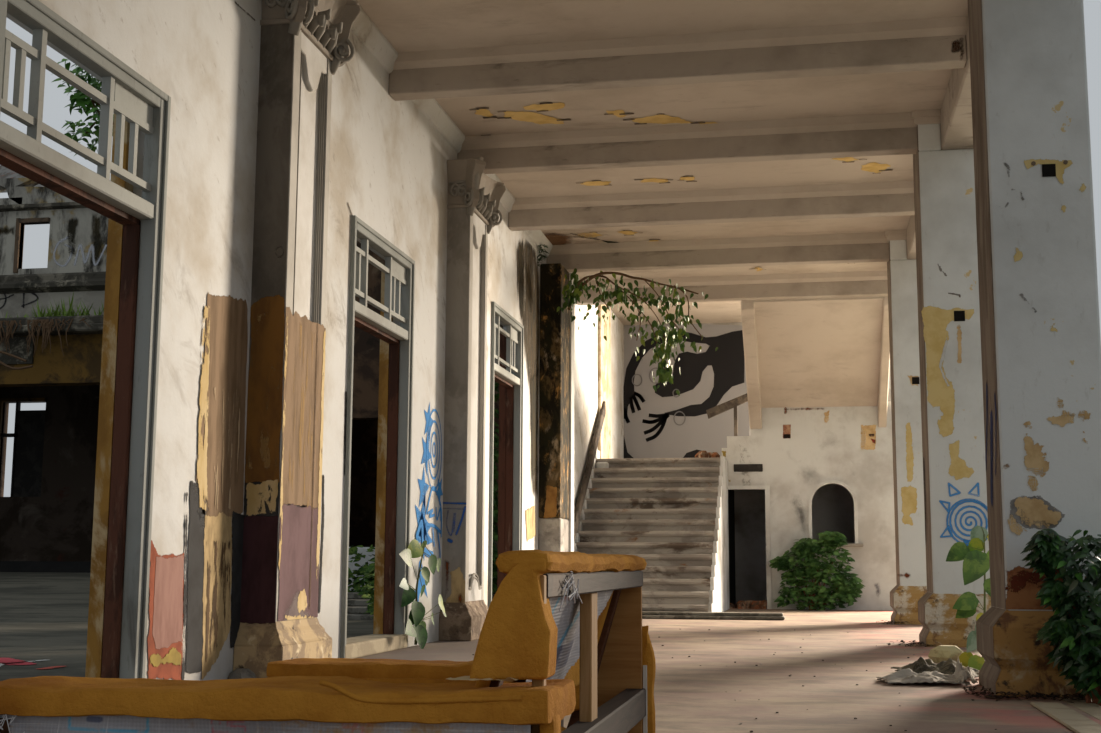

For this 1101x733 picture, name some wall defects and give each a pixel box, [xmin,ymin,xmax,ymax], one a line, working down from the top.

peeling [475,102,571,124]
peeling [604,110,716,125]
peeling [1024,159,1073,185]
peeling [907,306,974,480]
peeling [1047,398,1090,444]
peeling [901,423,917,526]
peeling [1008,421,1065,535]